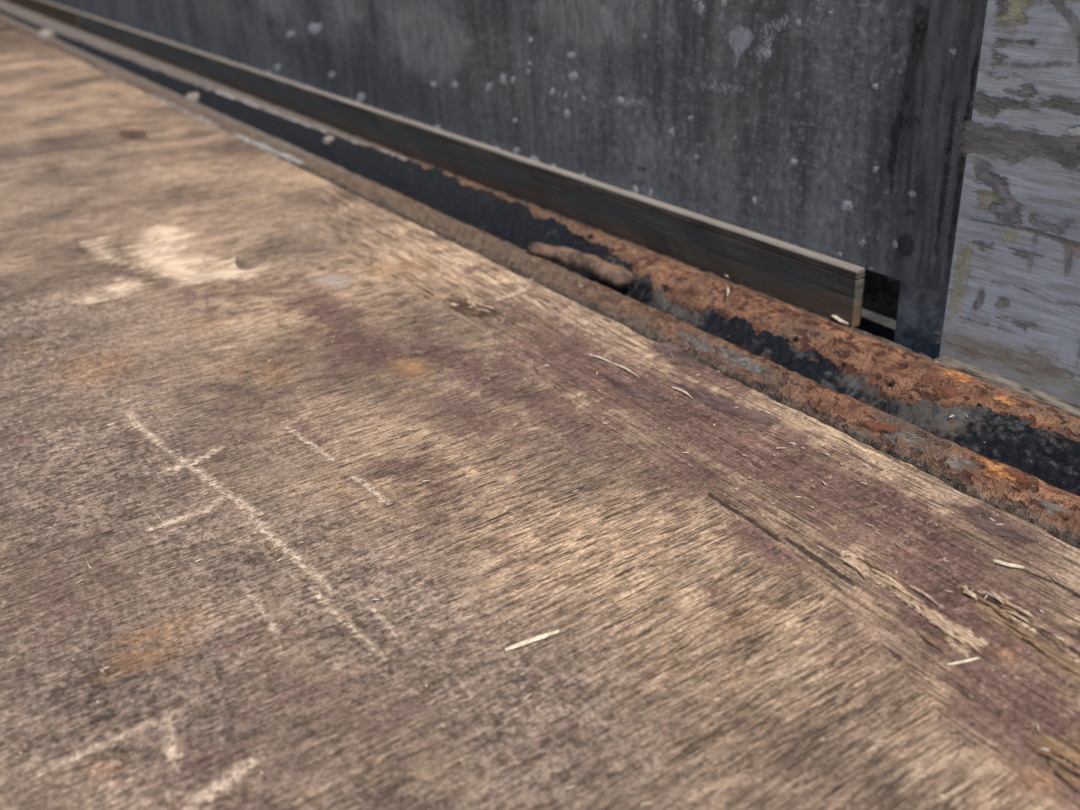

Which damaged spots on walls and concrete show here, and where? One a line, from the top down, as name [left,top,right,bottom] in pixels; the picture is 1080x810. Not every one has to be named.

peeling [0,9,1080,496]
corrosion [934,370,971,398]
corrosion [979,456,1036,488]
spalling [836,548,988,658]
spalling [953,578,1080,682]